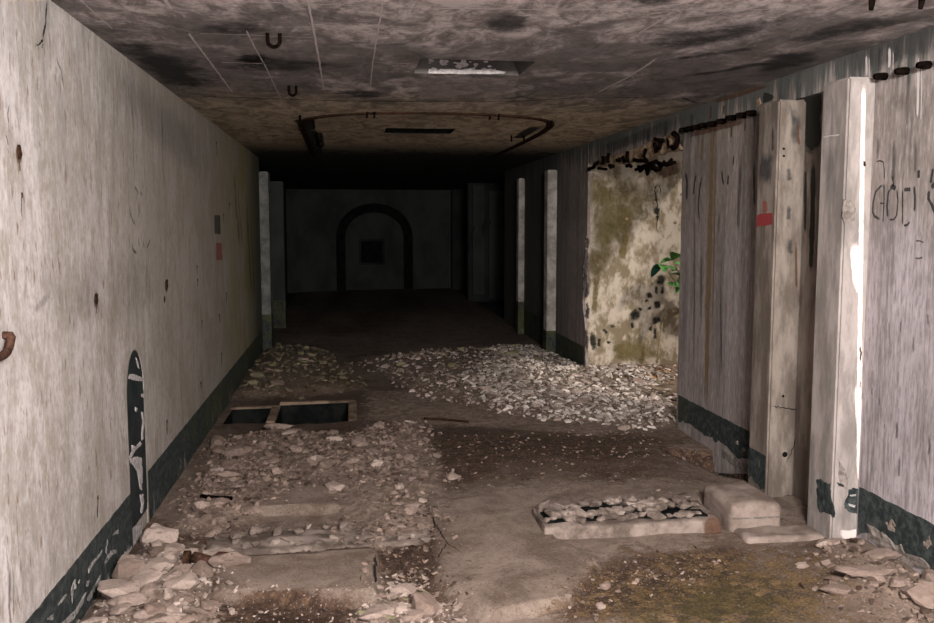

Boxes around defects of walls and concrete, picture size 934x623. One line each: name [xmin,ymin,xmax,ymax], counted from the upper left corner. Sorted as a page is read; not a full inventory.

leakage [126,45,206,85]
peeling [427,59,505,74]
leakage [591,177,660,312]
leakage [630,275,665,338]
leakage [590,325,614,350]
peeling [129,407,144,513]
peeling [816,461,858,518]
peeling [130,524,143,551]
peeling [47,529,119,623]